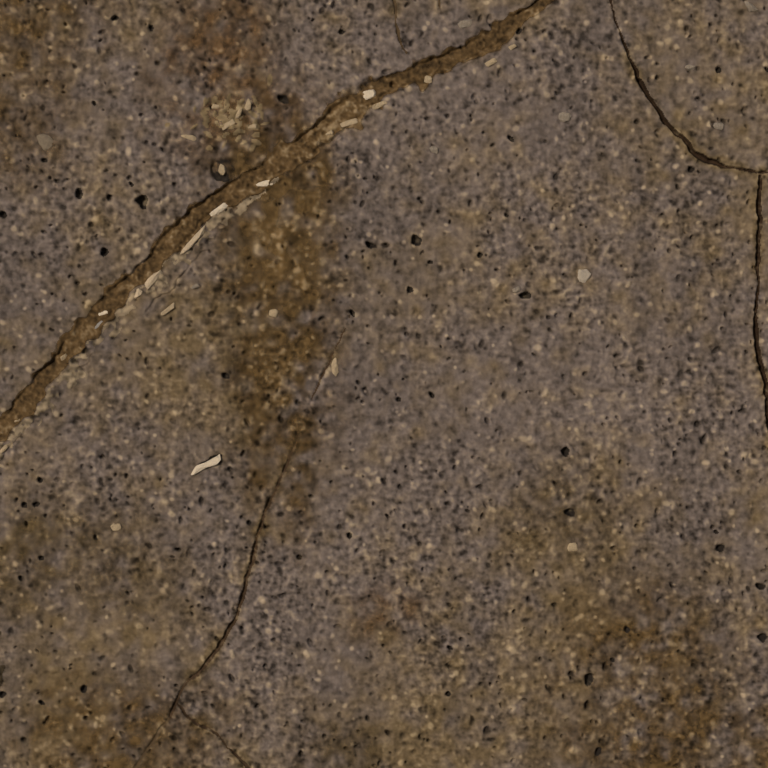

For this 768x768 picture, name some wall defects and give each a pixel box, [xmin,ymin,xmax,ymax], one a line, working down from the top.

crack [0,0,555,467]
crack [609,0,768,429]
crack [134,431,299,768]